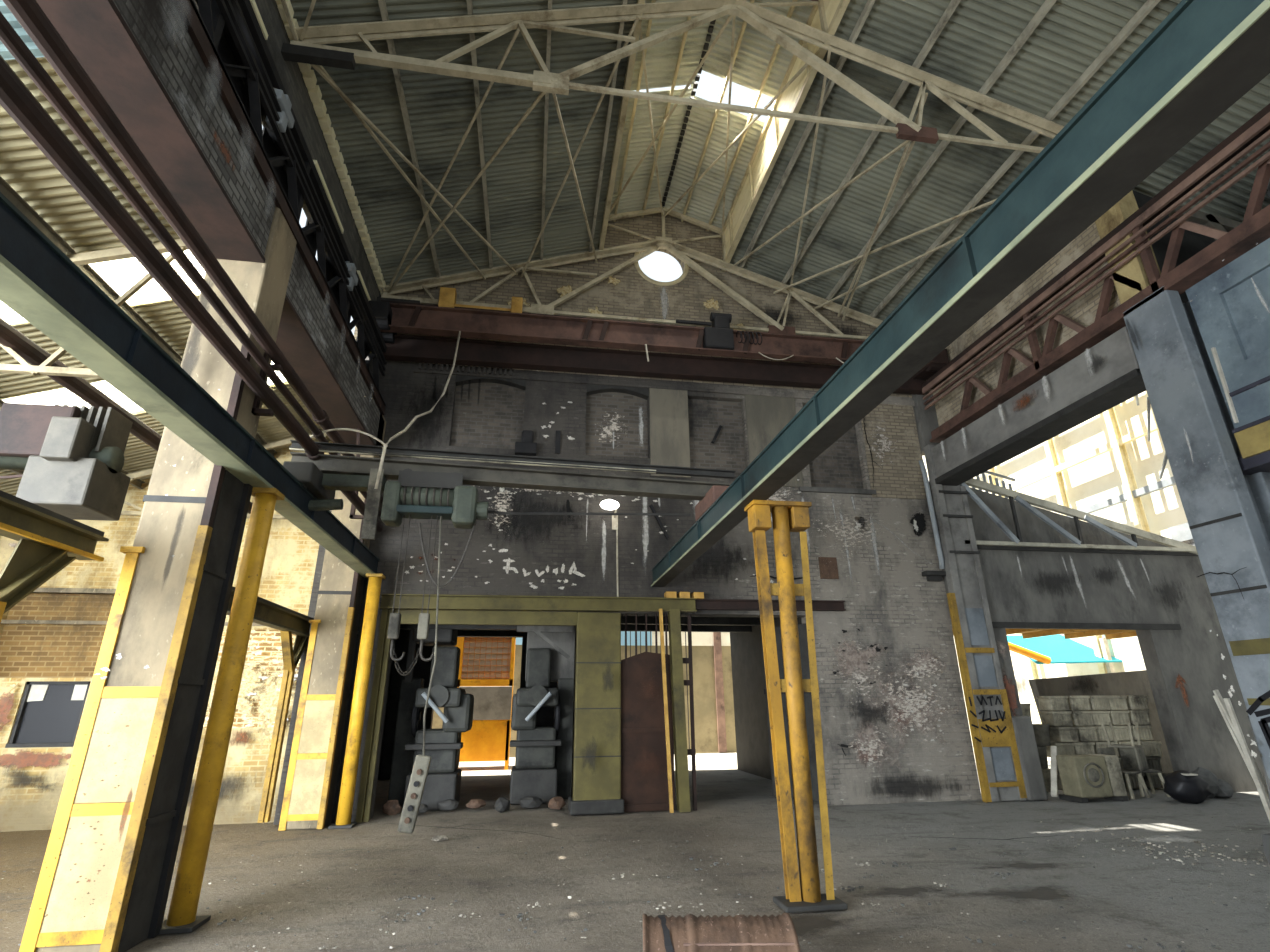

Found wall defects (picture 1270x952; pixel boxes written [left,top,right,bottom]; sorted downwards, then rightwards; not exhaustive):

peeling [595,408,627,442]
leakage [489,498,588,540]
peeling [477,486,679,590]
flaking render [0,684,17,730]
leakage [849,703,886,728]
flaking render [820,629,958,772]
flaking render [0,730,110,779]
leakage [872,777,959,796]